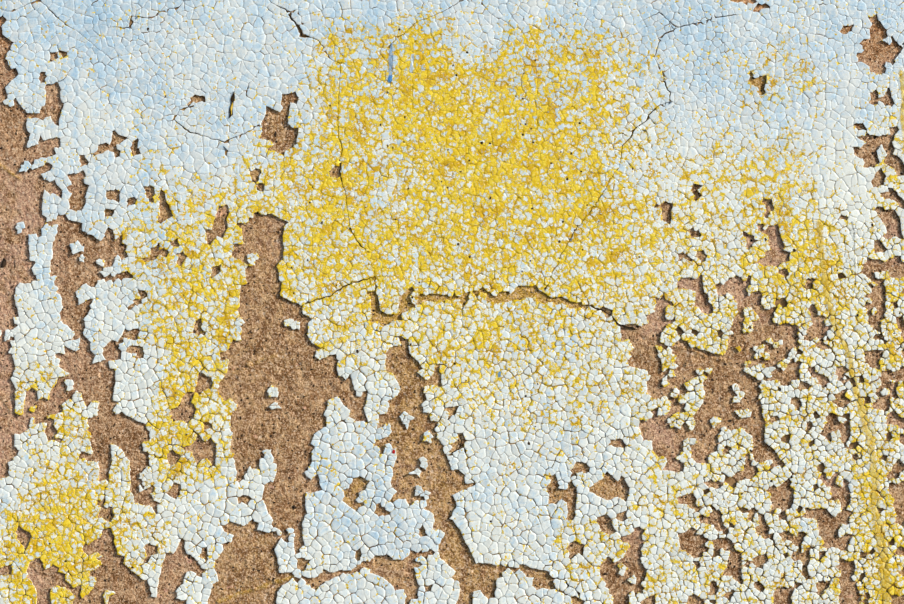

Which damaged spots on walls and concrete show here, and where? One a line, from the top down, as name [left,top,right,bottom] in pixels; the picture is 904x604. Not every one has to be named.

crack [119,0,190,29]
crack [171,107,258,142]
crack [269,0,369,252]
crack [544,13,732,289]
peeling [839,15,904,108]
peeling [0,15,591,604]
crack [303,277,376,305]
crack [587,305,638,330]
peeling [741,194,819,289]
peeling [850,117,904,527]
peeling [601,273,872,604]
peeling [540,458,662,604]